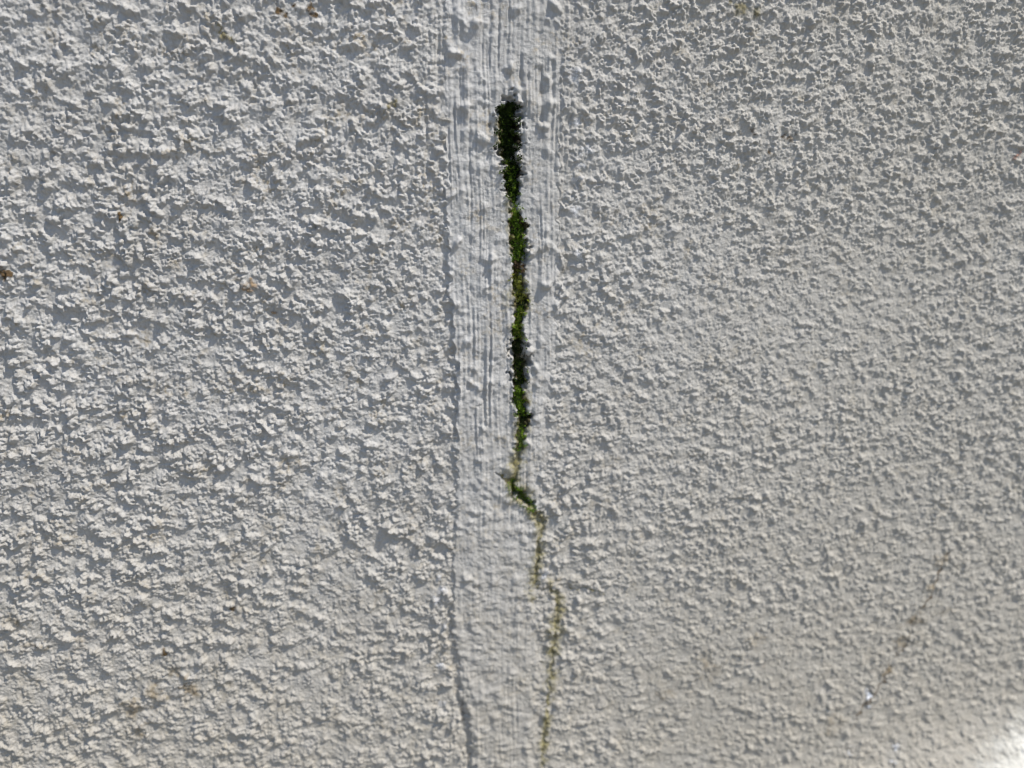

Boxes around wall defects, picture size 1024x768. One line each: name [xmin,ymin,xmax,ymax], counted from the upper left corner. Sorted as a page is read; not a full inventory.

crack [497,101,532,488]